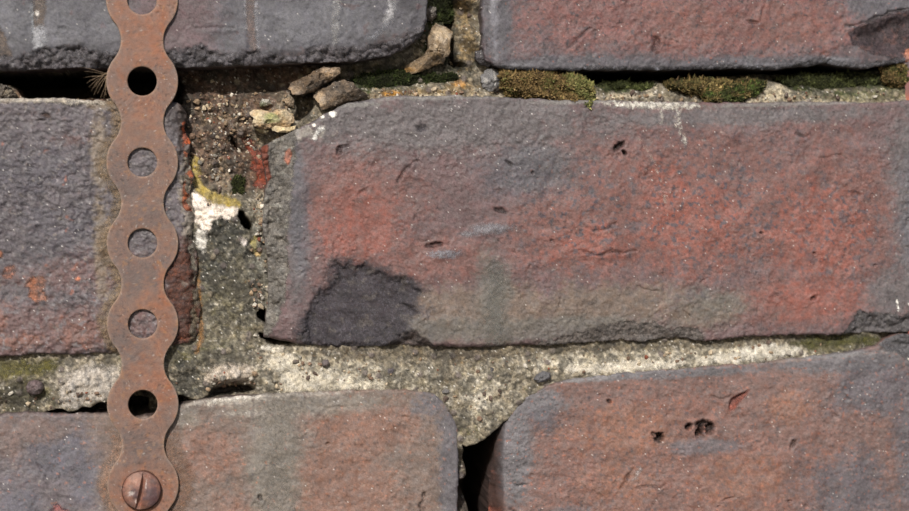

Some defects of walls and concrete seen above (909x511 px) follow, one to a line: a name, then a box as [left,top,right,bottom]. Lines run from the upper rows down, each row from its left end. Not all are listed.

corrosion [97,101,121,353]
corrosion [165,245,203,353]
corrosion [164,438,194,511]